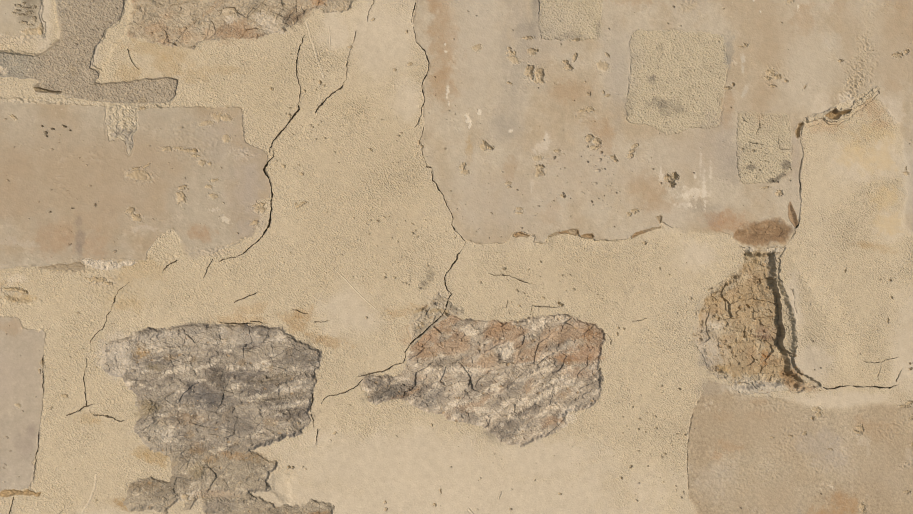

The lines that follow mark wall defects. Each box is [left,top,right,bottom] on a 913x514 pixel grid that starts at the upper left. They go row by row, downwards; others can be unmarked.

spalling [0,0,356,156]
spalling [101,323,335,514]
crack [203,32,356,278]
crack [310,3,465,441]
spalling [362,292,625,447]
spalling [692,186,822,395]